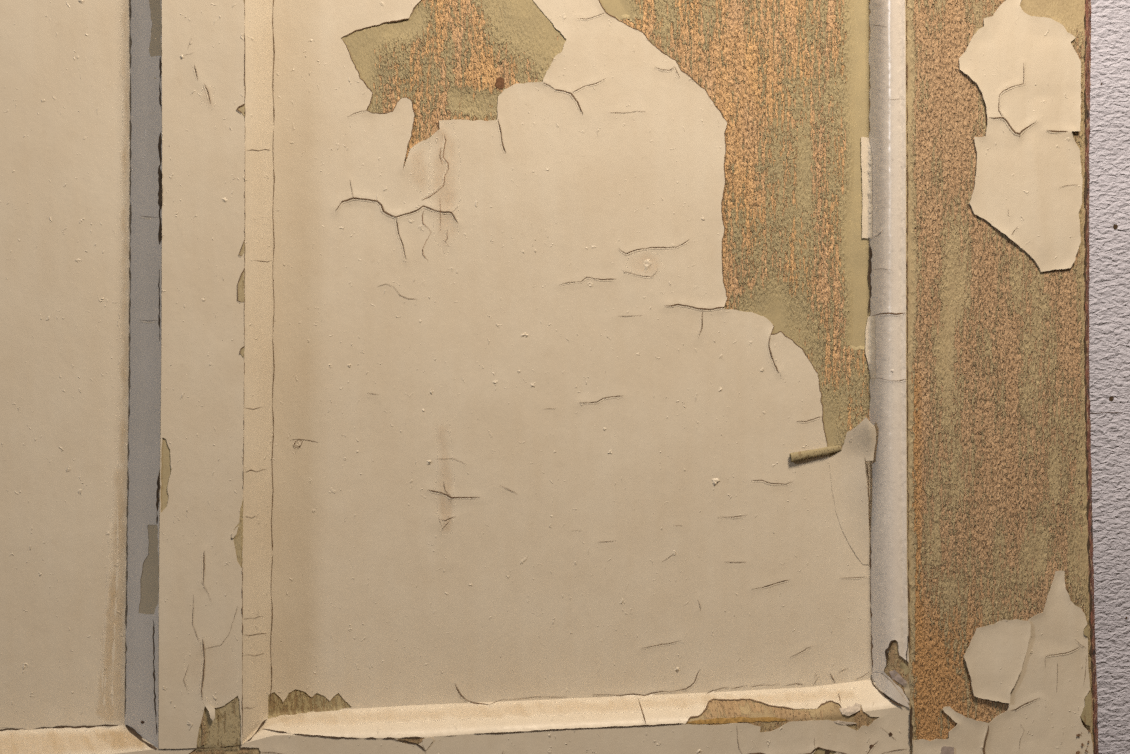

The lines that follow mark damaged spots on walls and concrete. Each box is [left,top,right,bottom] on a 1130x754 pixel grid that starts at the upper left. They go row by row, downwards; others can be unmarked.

peeling [341,0,566,168]
crack [543,79,607,114]
crack [336,136,457,260]
crack [561,240,689,286]
peeling [599,0,876,565]
crack [635,304,725,337]
peeling [874,0,1094,754]
crack [427,458,475,530]
crack [183,550,266,695]
peeling [189,696,261,754]
peeling [267,689,351,719]
peeling [686,698,879,732]